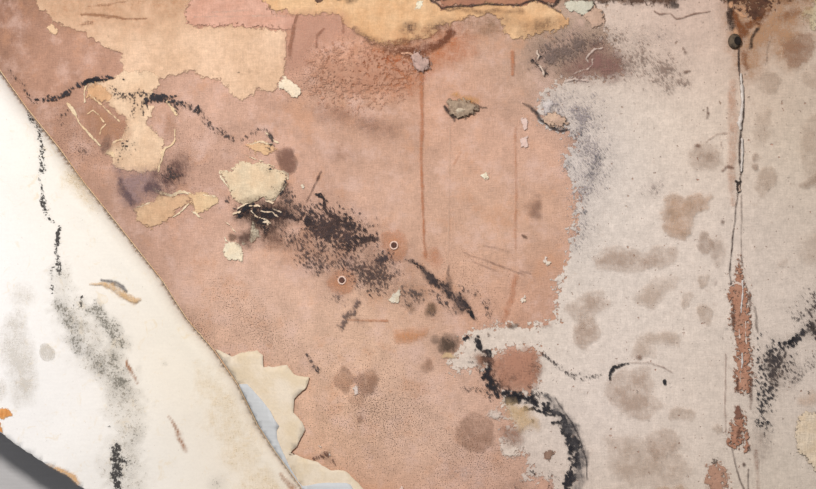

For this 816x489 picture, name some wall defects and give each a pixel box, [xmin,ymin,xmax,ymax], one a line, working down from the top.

peeling [0,71,301,489]
water stain [10,70,492,329]
spalling [278,15,426,113]
water stain [439,333,629,489]
water stain [528,19,691,251]
crack [729,201,742,285]
crack [737,49,745,180]
water stain [749,277,816,442]